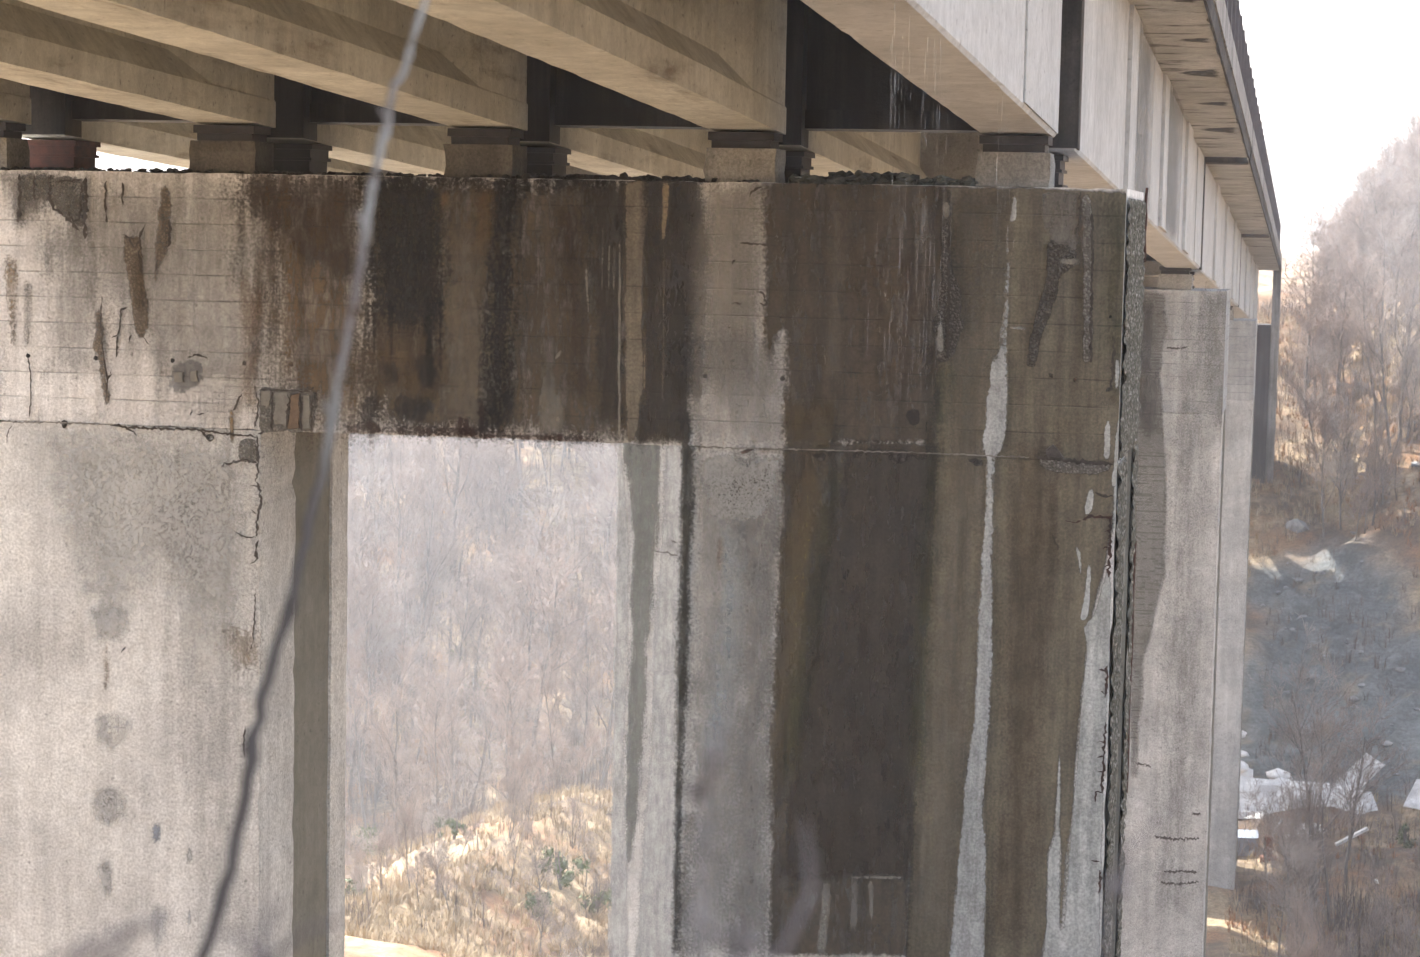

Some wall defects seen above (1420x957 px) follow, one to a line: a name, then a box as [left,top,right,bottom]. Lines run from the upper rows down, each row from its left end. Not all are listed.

spalling [221,385,315,482]
damp [238,174,1167,957]
spalling [1027,188,1149,957]